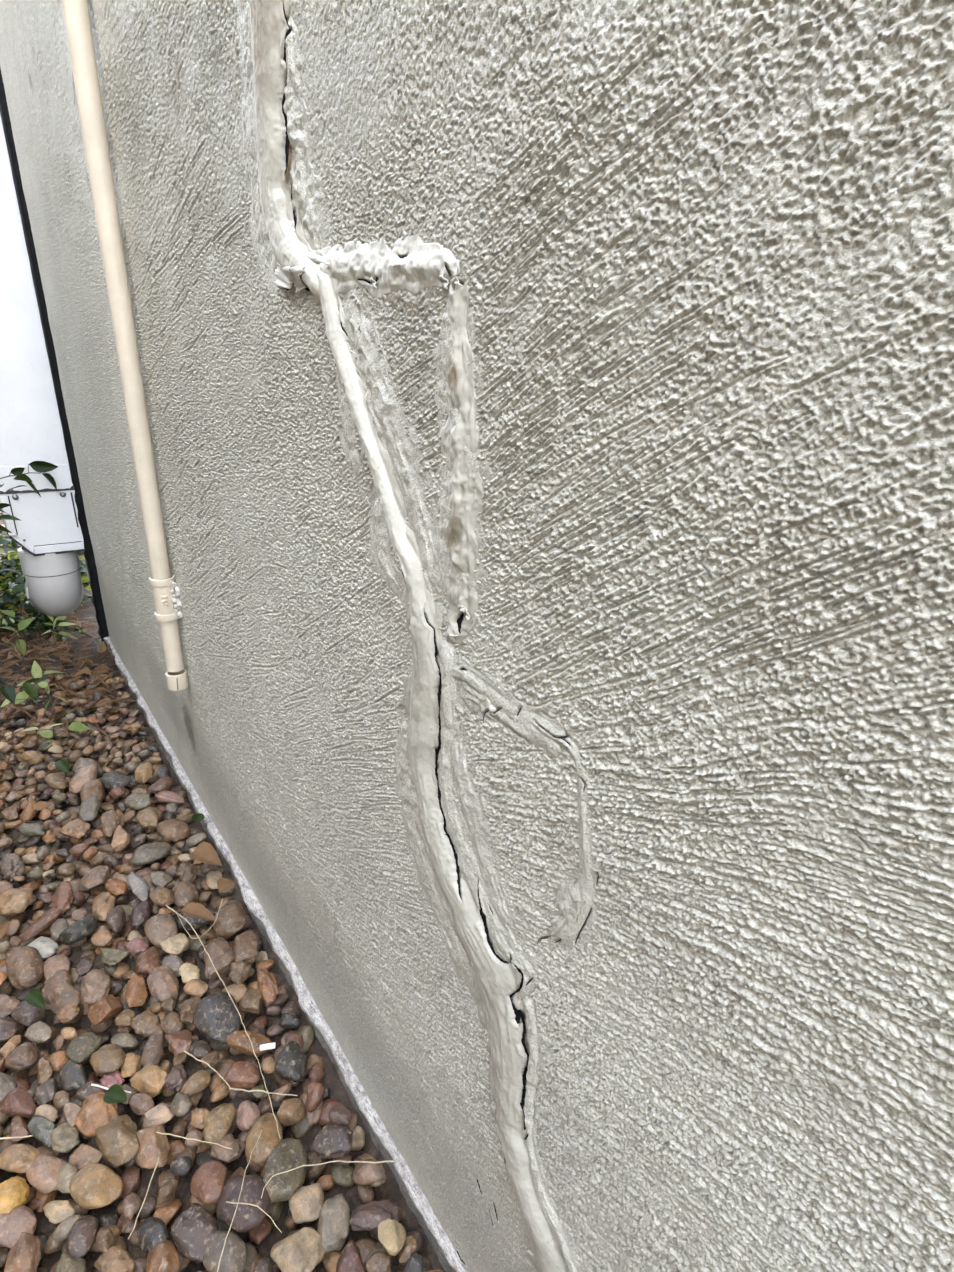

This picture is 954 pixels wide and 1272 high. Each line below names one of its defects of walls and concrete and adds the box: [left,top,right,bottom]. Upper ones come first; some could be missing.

crack [282,4,297,229]
crack [424,612,599,1164]